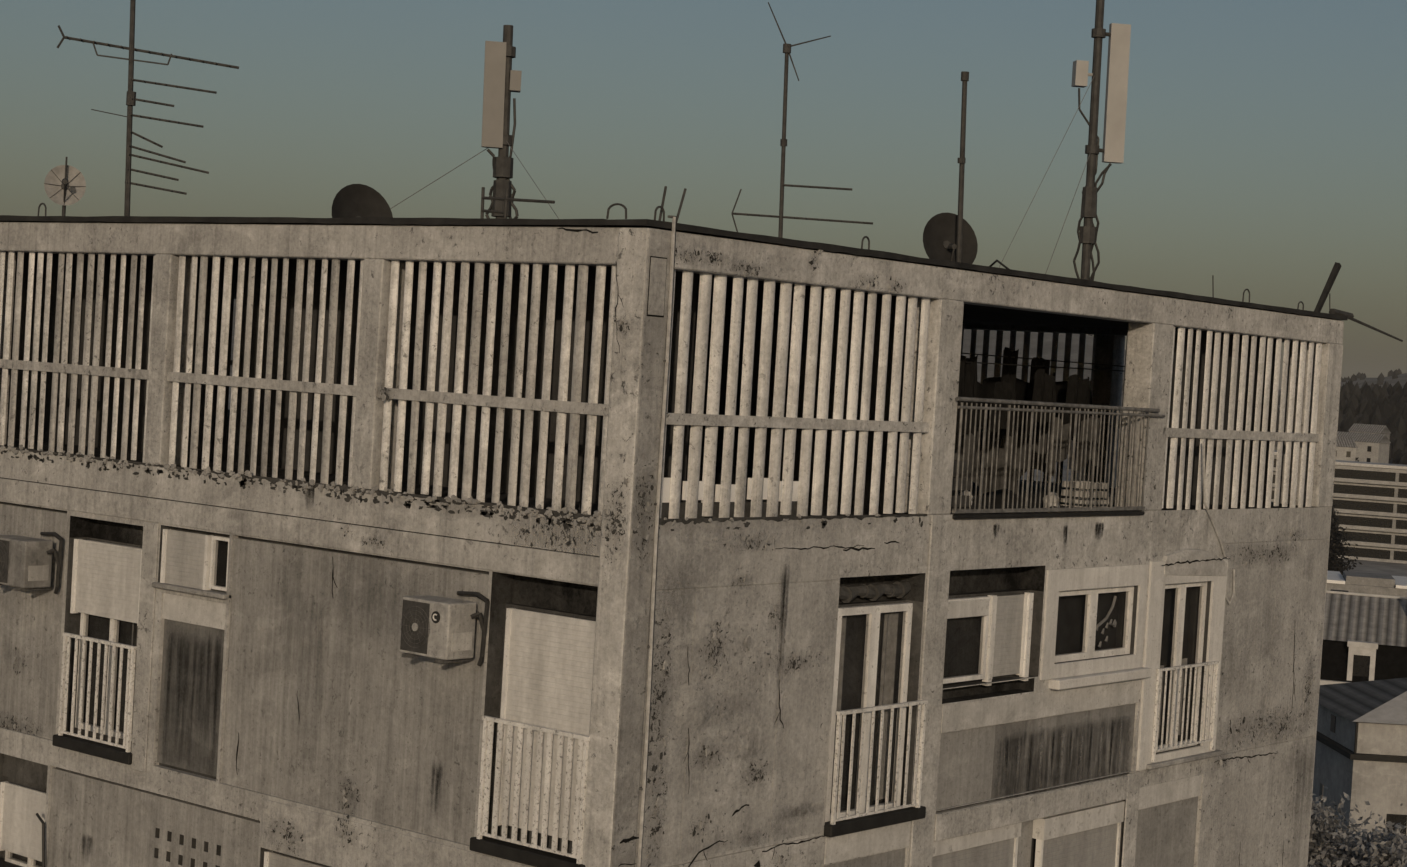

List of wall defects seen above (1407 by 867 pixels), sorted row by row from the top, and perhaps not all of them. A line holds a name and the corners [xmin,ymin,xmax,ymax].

crack [776,541,899,551]
crack [775,681,784,728]
leakage [1000,723,1127,798]
crack [688,804,749,867]
crack [762,836,825,859]